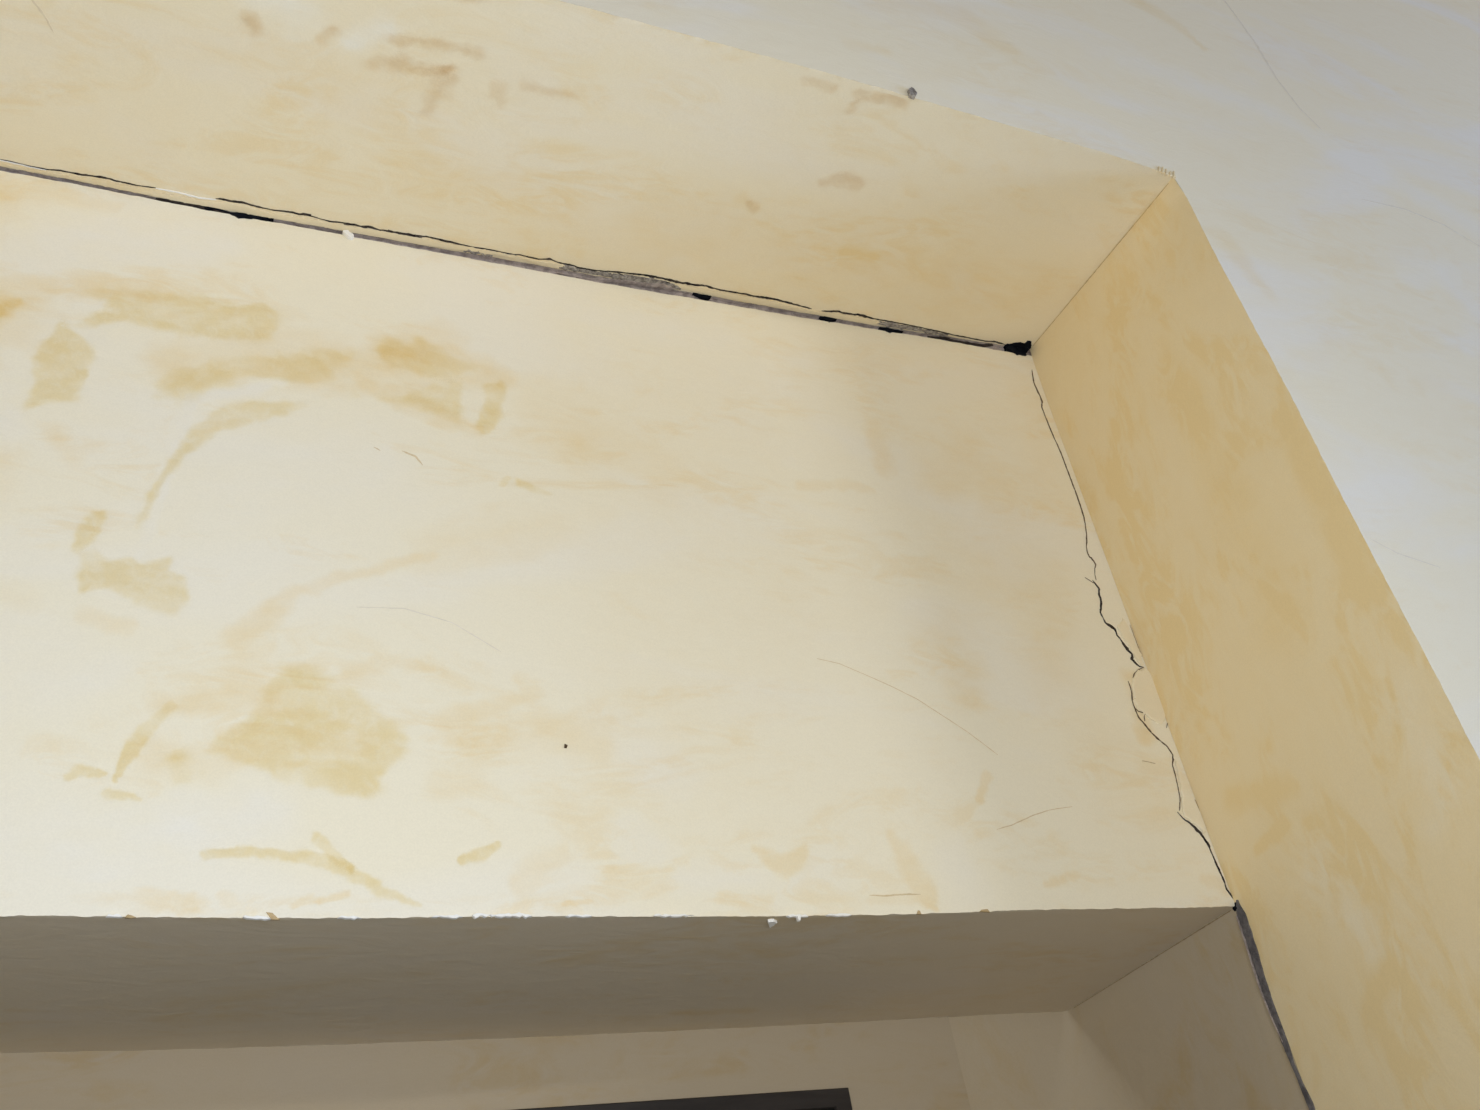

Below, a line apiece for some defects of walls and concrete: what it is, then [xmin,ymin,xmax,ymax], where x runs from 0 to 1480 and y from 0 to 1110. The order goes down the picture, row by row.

crack [0,159,1233,1008]